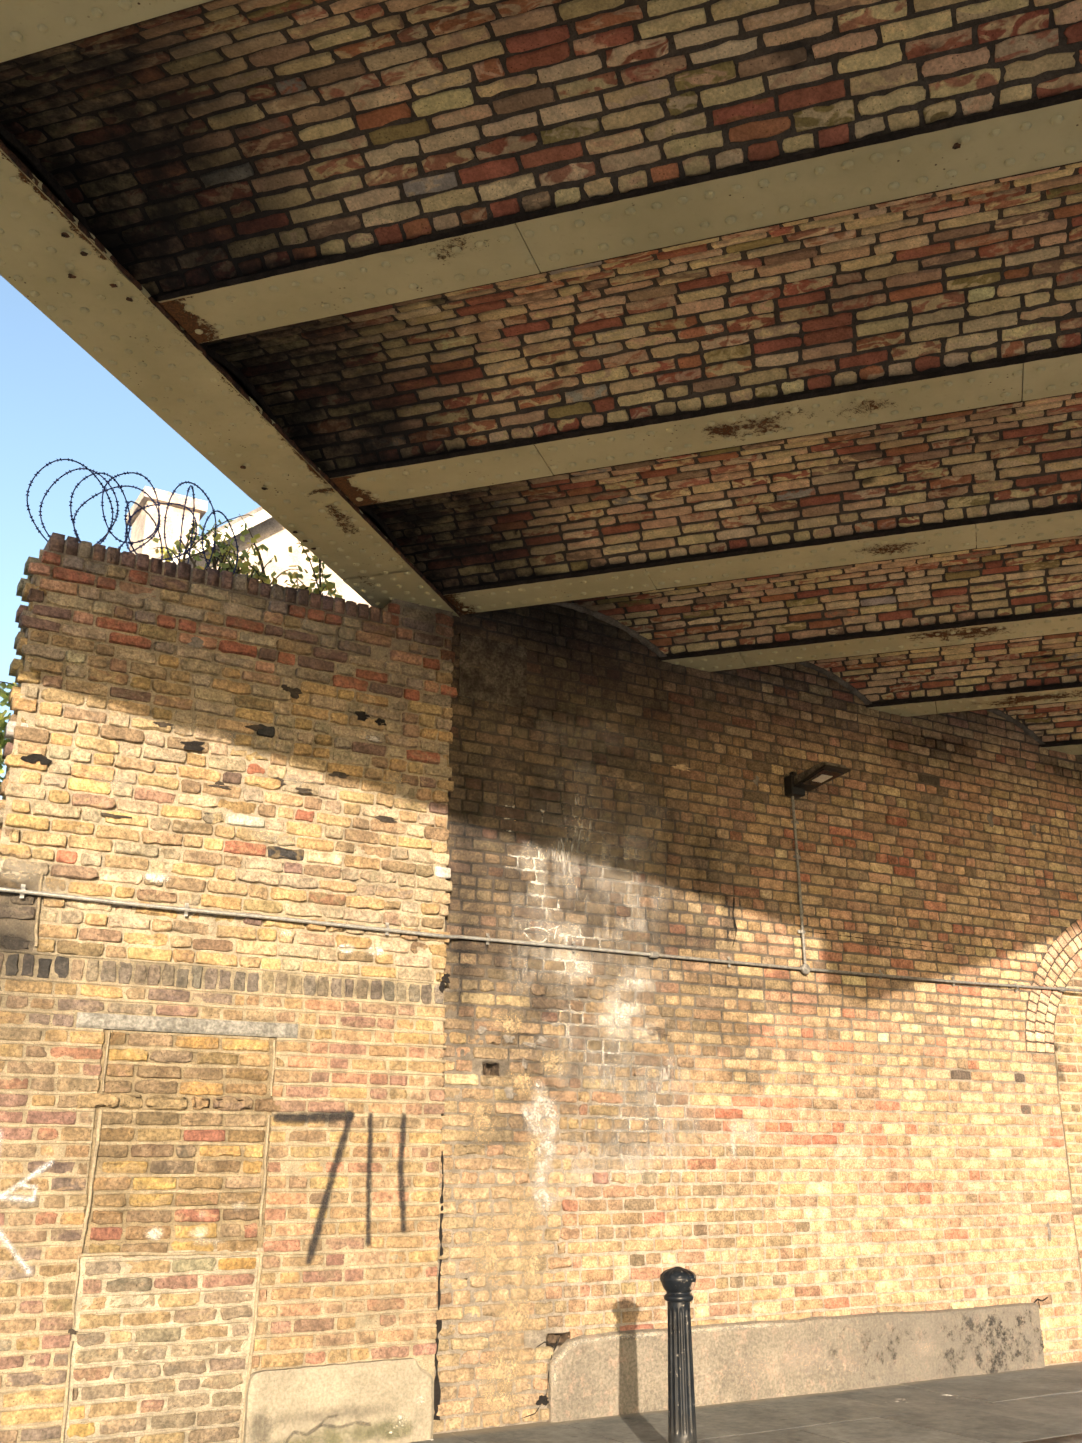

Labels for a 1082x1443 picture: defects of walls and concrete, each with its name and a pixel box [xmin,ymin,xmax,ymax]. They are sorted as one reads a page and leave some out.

rust [0,151,107,260]
rust [142,295,219,343]
rust [703,407,815,441]
rust [854,542,925,555]
rust [909,627,1015,644]
water stain [552,793,592,879]
water stain [522,1083,557,1207]